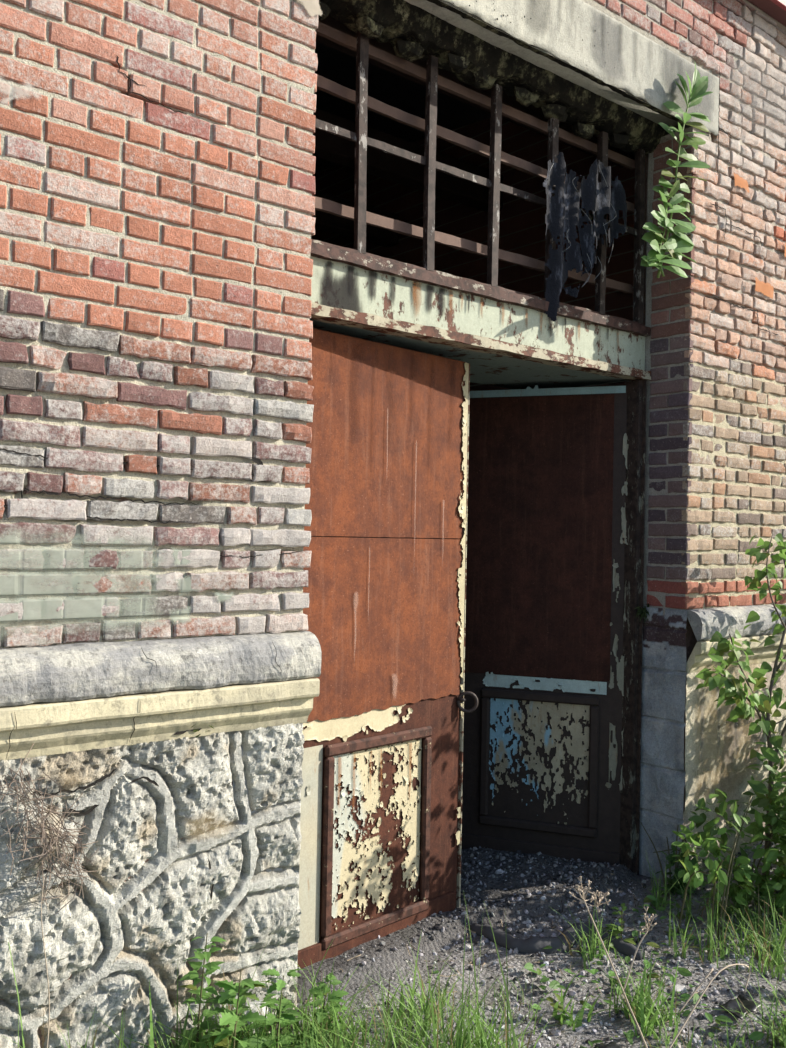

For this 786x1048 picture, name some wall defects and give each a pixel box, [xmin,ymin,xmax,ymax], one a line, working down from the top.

crack [116,55,183,113]
crack [0,448,48,459]
crack [4,488,199,524]
peeling [457,362,626,690]
peeling [620,433,629,545]
peeling [483,560,626,825]
crack [31,769,159,816]
peeling [298,704,422,950]